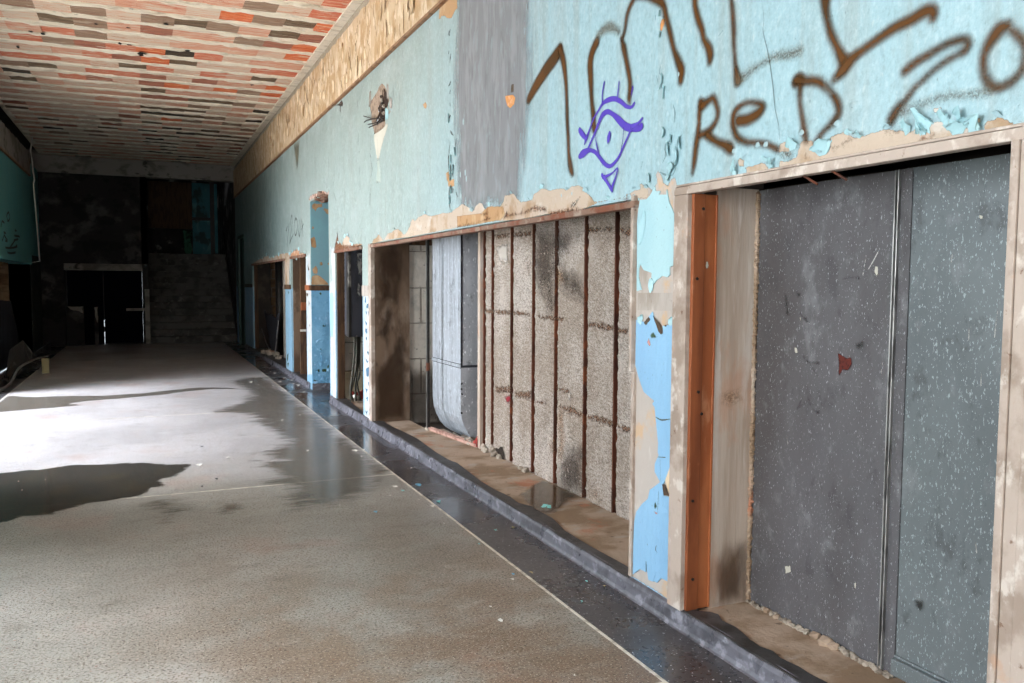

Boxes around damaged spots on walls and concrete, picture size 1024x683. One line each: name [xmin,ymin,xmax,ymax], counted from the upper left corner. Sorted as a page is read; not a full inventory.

spalling [363,84,392,133]
peeling [730,105,1013,175]
spalling [764,144,1011,190]
peeling [254,172,677,598]